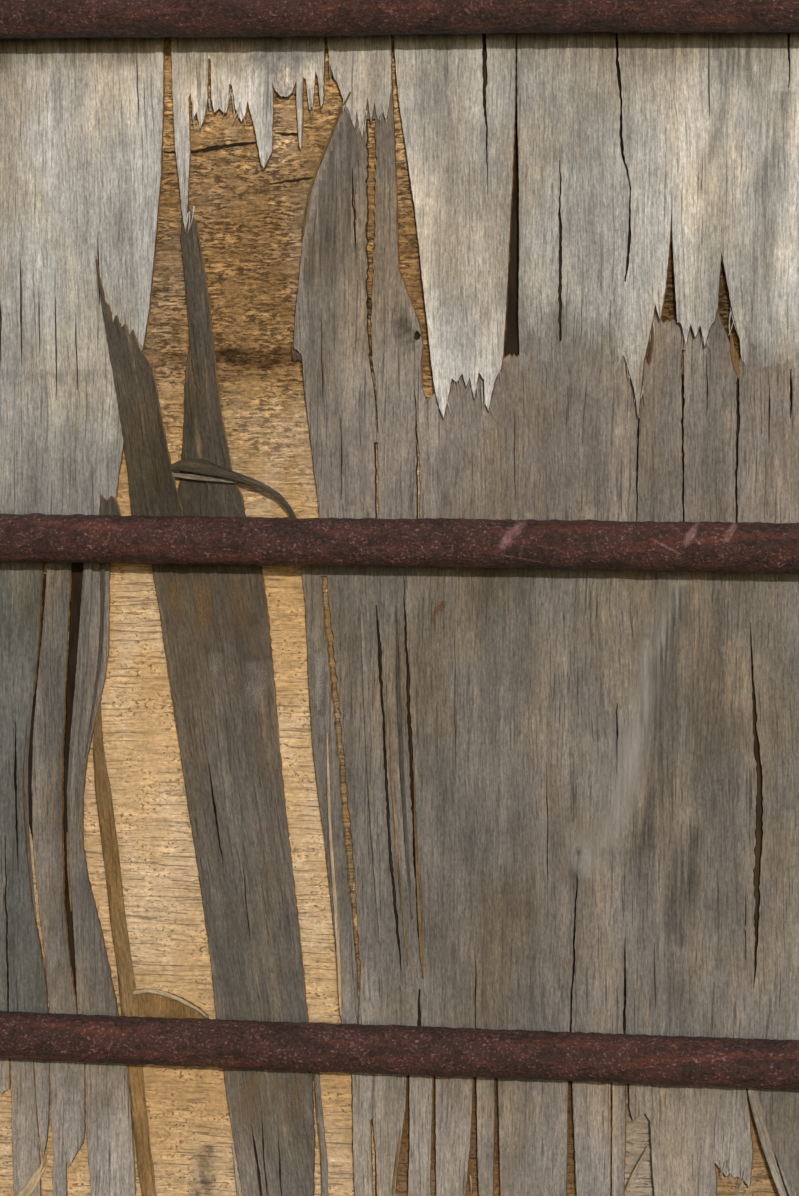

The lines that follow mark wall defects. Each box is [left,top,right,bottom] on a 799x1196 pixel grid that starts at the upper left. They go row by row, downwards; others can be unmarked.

peeling [96,33,517,517]
crack [482,34,519,356]
crack [616,33,631,282]
peeling [646,329,654,365]
peeling [31,562,209,1019]
crack [745,622,763,984]
peeling [0,1059,137,1196]
peeling [351,1072,799,1196]